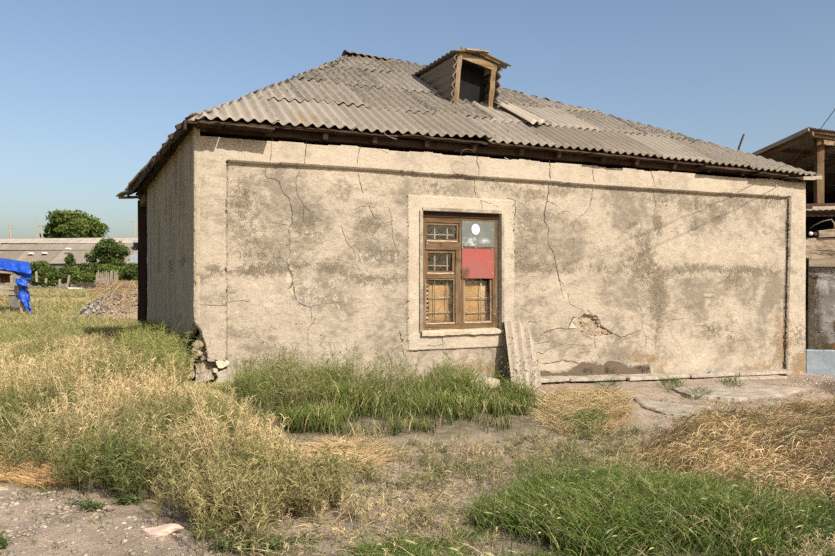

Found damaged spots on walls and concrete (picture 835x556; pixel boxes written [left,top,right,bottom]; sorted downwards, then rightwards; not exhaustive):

crack [265,142,343,345]
crack [527,160,741,373]
spalling [569,314,610,336]
rust [808,273,835,350]
damp [540,353,662,376]